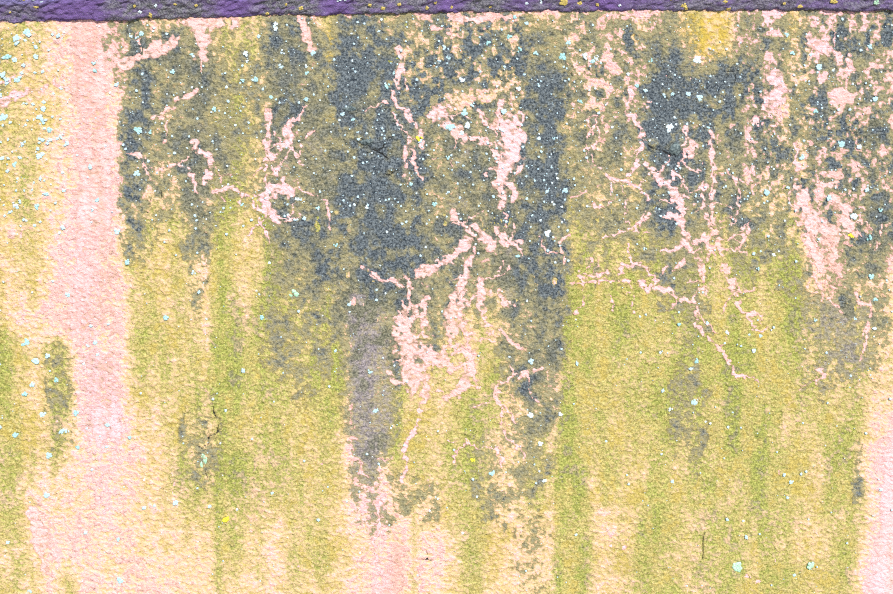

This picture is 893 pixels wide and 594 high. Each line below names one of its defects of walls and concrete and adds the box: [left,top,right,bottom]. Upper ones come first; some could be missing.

damp [784,238,803,262]
damp [816,273,838,298]
damp [863,262,893,320]
damp [816,380,837,396]
damp [851,467,865,504]